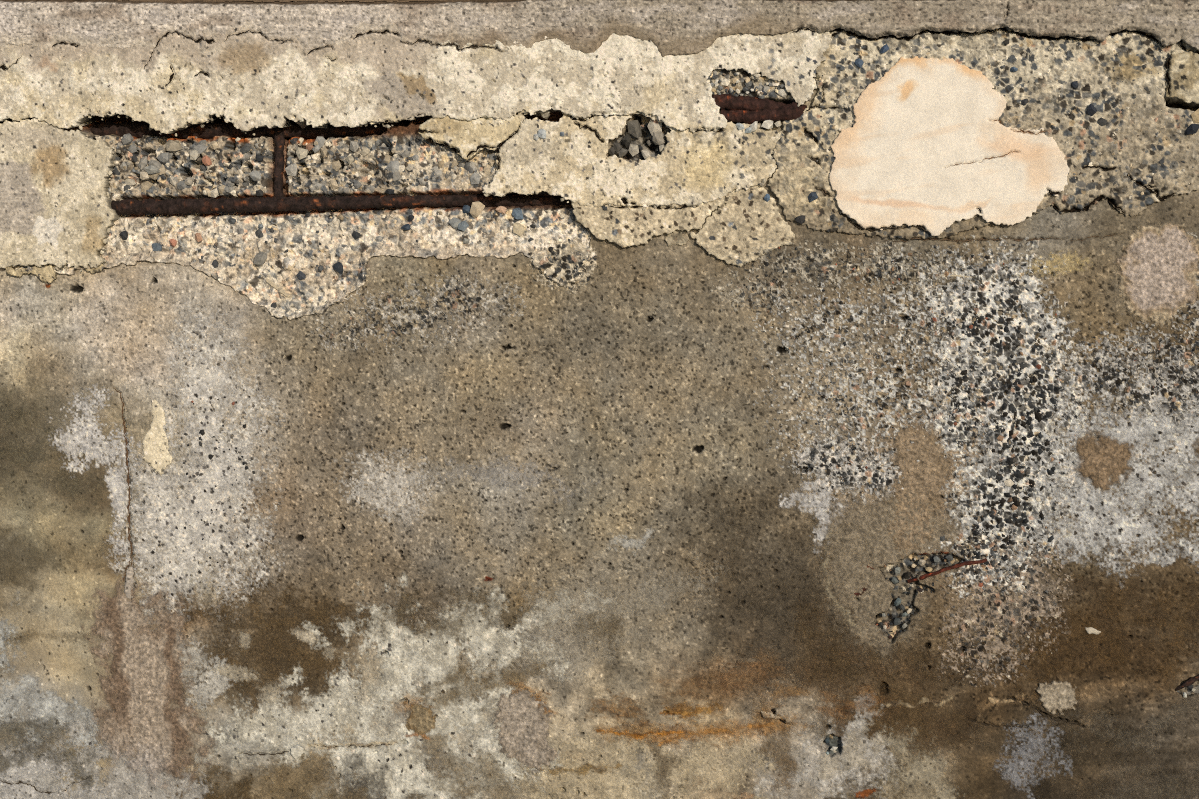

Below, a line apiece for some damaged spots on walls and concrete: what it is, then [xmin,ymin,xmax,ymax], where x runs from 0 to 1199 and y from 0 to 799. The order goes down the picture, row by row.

crack [792,4,1199,95]
corrosion [712,94,807,124]
corrosion [88,120,570,216]
flaking render [0,26,1199,320]
water stain [1022,251,1089,276]
crack [114,388,132,600]
water stain [979,392,1199,577]
water stain [0,306,958,799]
corrosion [597,704,730,746]
water stain [995,715,1071,799]